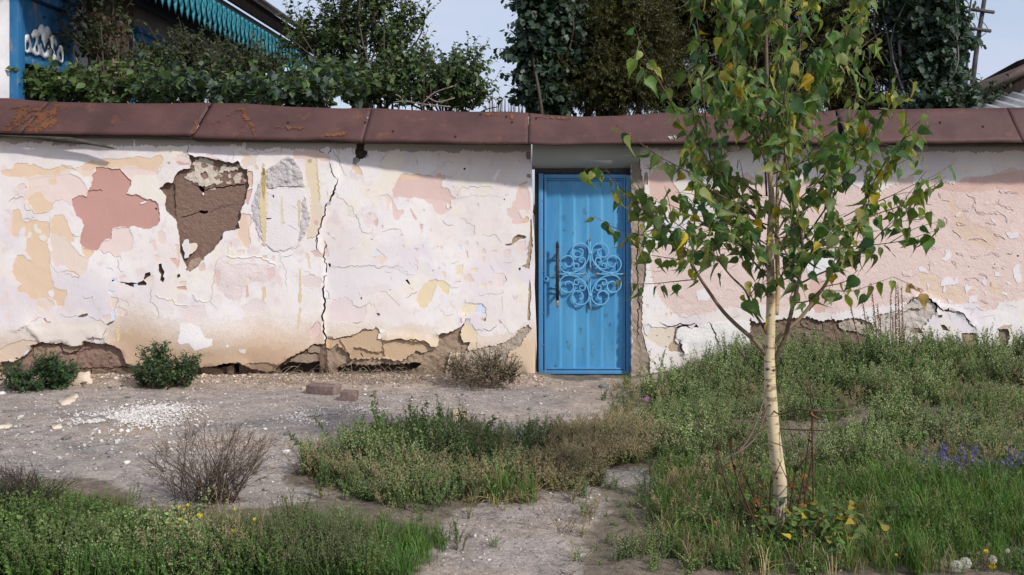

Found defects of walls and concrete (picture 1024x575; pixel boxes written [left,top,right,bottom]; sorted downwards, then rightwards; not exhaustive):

corrosion [3,104,67,132]
spalling [0,339,137,374]
spalling [2,151,258,326]
crack [160,149,513,368]
peeling [195,173,533,374]
peeling [630,156,1024,376]